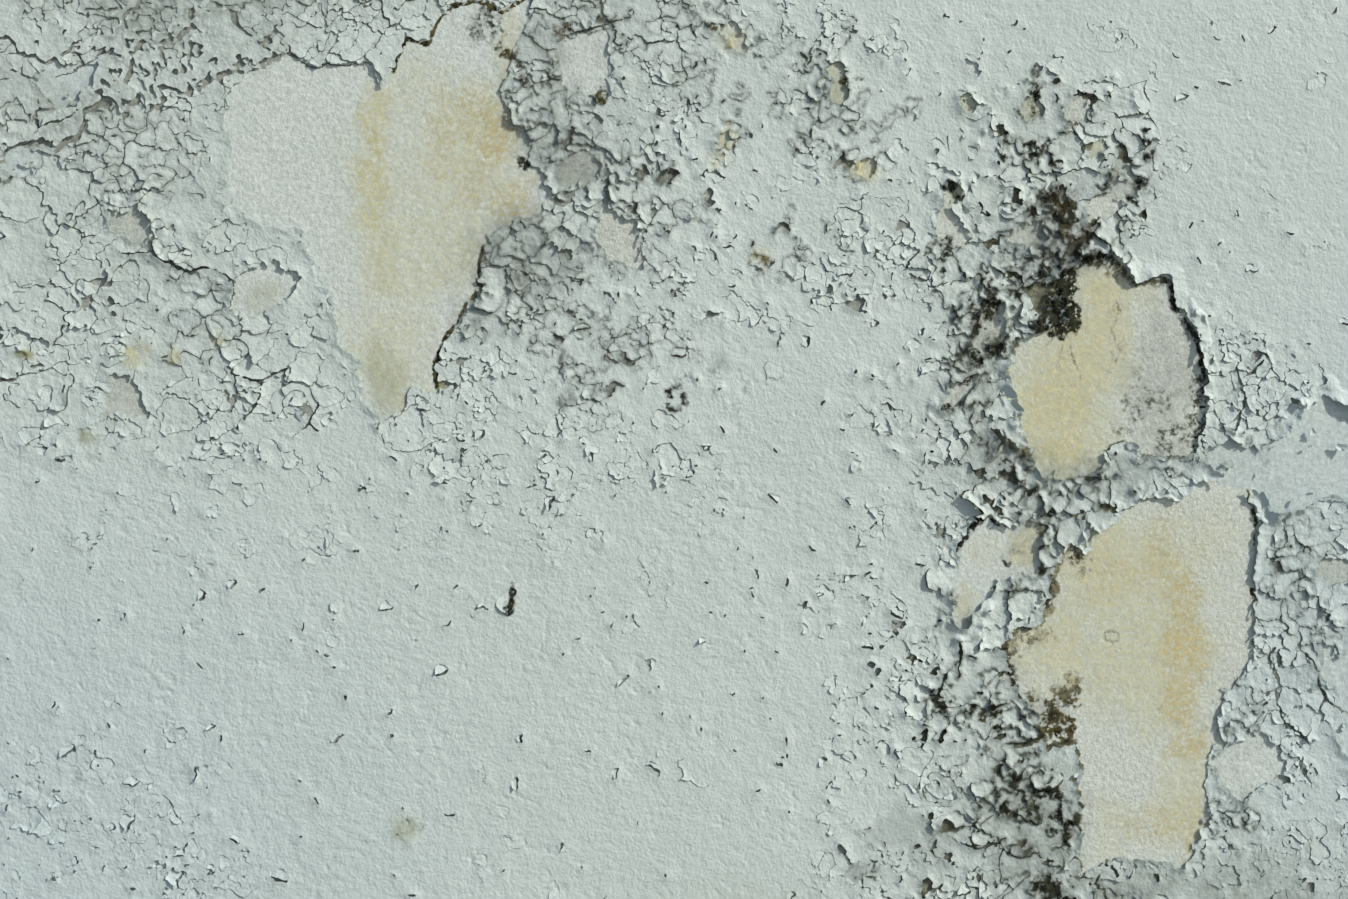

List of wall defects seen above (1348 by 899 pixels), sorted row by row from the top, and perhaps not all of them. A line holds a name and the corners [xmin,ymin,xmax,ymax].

damp [392,0,552,93]
peeling [965,53,982,77]
peeling [1031,54,1064,84]
damp [421,107,531,180]
damp [941,178,964,201]
damp [379,215,500,389]
peeling [0,0,922,570]
peeling [691,62,1348,899]
damp [925,186,1207,845]
peeling [463,588,517,618]
peeling [645,749,709,788]
damp [1004,842,1076,899]